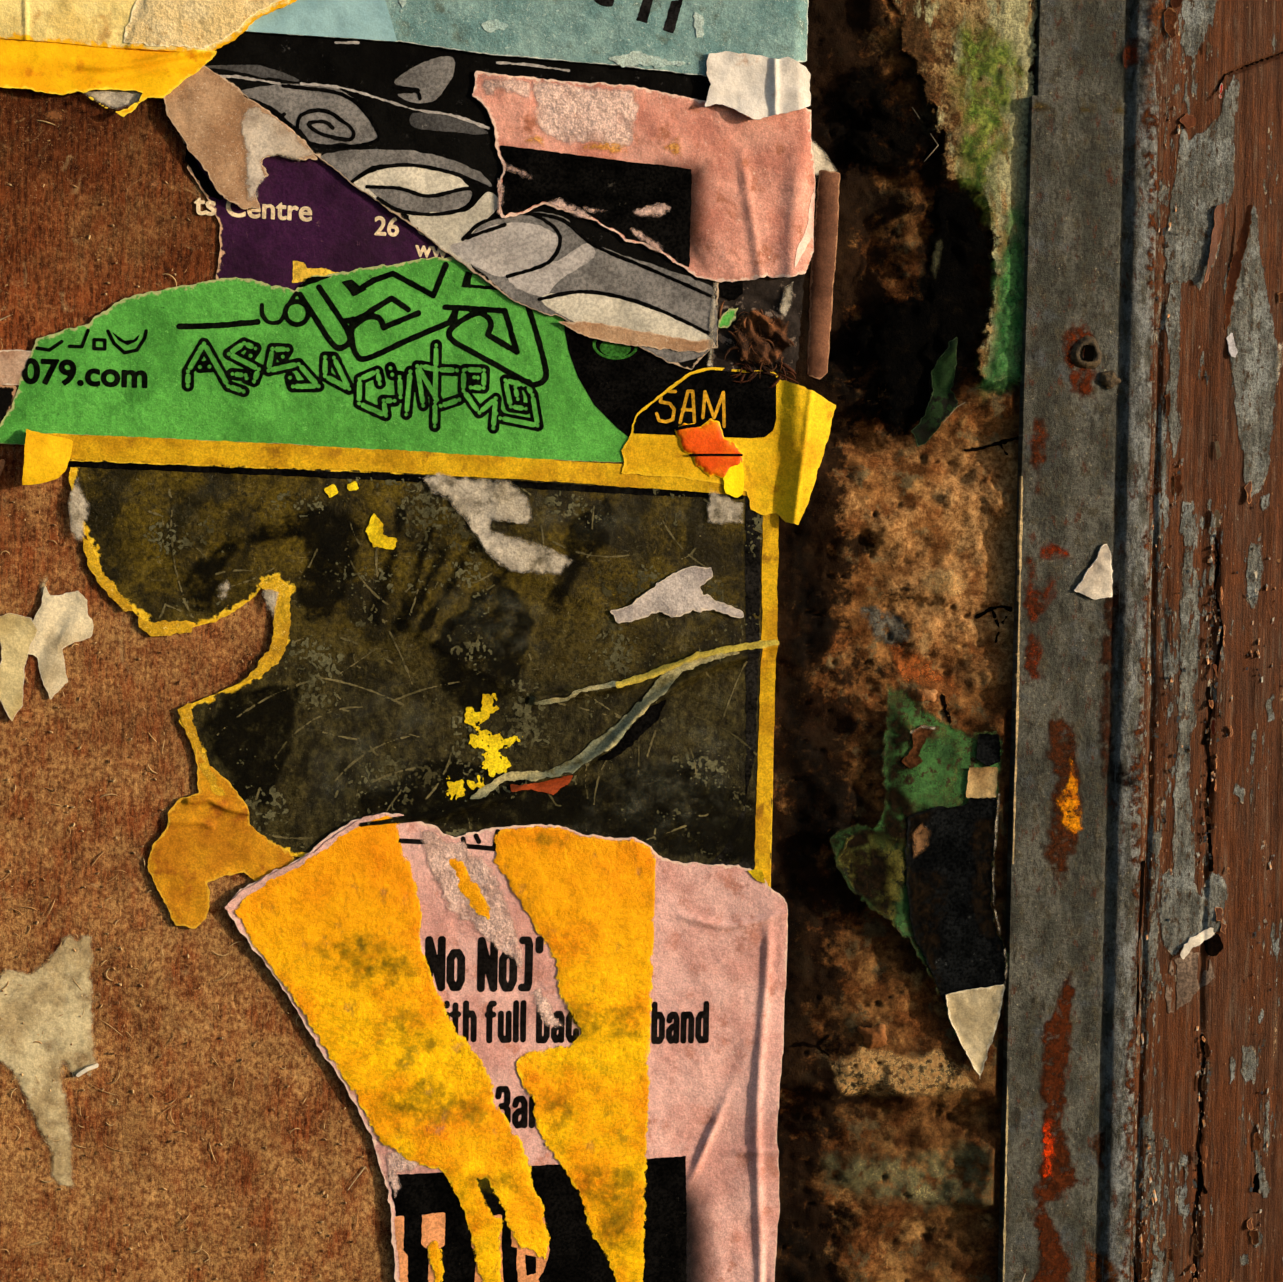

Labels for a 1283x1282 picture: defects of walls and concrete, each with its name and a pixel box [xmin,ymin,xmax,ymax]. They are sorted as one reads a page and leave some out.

rust [1031,419,1047,493]
rust [1024,544,1069,679]
rust [1045,719,1083,879]
rust [1064,326,1096,396]
rust [1100,576,1150,1175]
rust [1124,0,1162,515]
peeling [1141,74,1283,1013]
crack [1202,537,1233,874]
rust [1031,973,1133,1282]
crack [1190,1034,1210,1282]